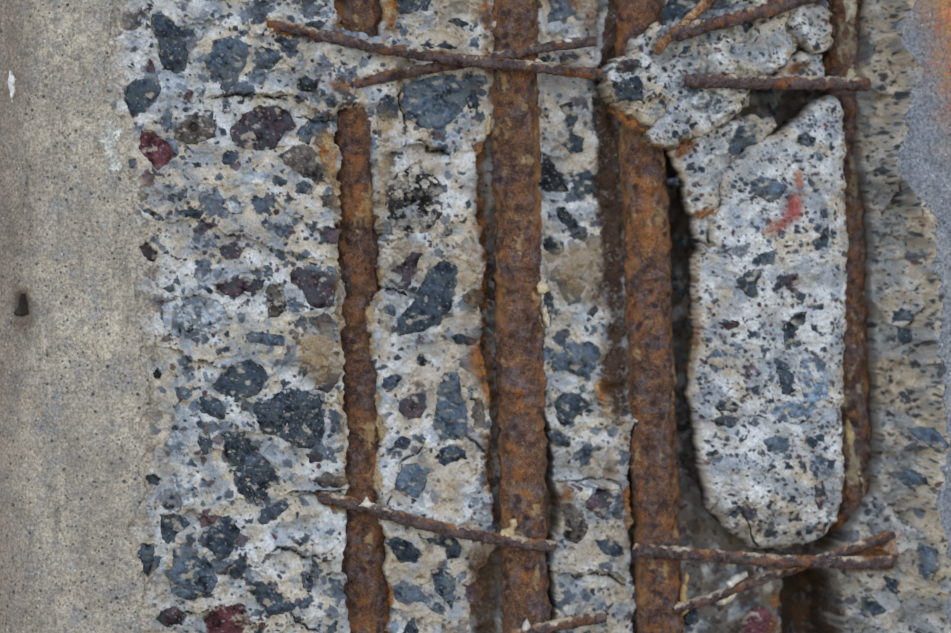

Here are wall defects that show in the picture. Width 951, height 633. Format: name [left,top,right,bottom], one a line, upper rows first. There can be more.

rust [381,0,397,35]
rust [478,0,493,30]
rust [788,62,810,75]
rust [677,139,694,157]
spalling [103,0,503,633]
spalling [536,0,638,633]
spalling [661,0,951,633]
rust [483,426,496,518]
rust [623,486,634,550]
rust [849,540,897,558]
rust [468,551,498,633]
rust [770,568,845,633]